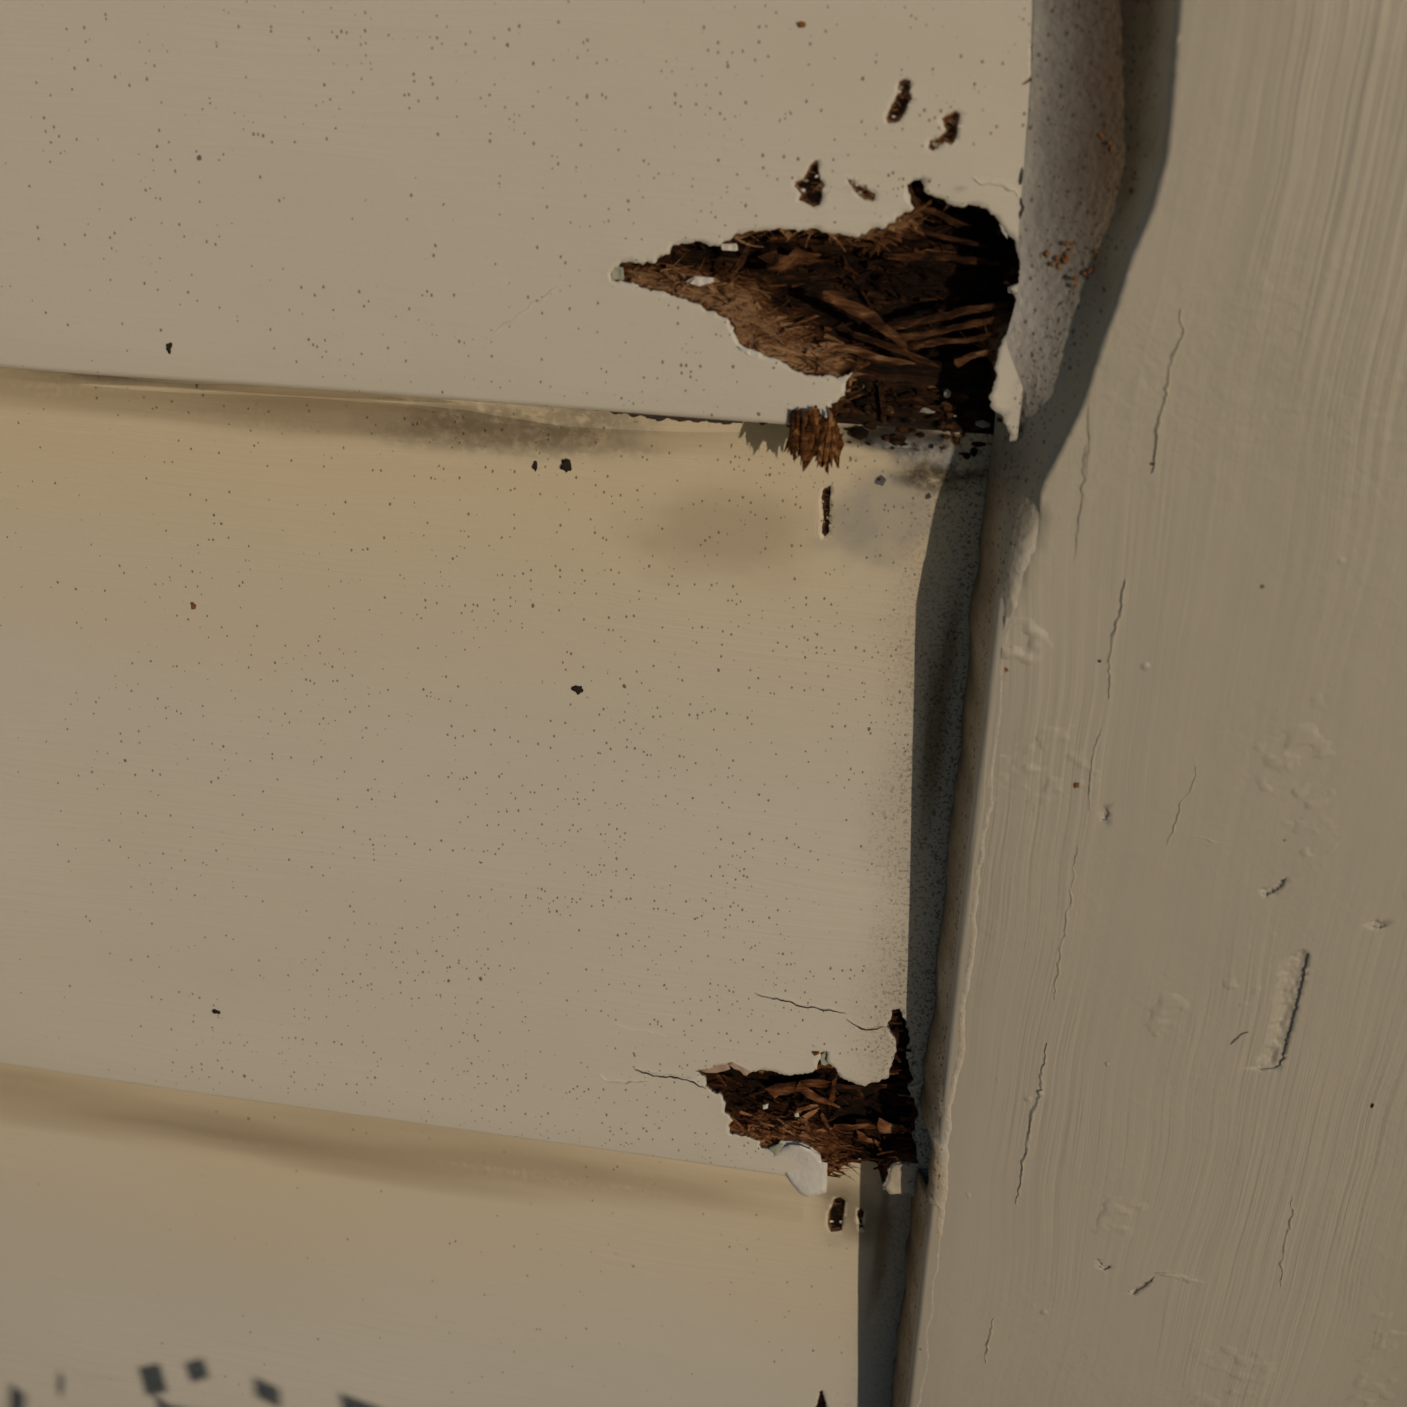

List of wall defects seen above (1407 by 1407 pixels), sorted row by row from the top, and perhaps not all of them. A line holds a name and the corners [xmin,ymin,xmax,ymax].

peeling [795,160,875,207]
peeling [721,243,738,251]
peeling [684,276,714,286]
peeling [737,346,765,358]
peeling [700,1063,750,1076]
peeling [769,1144,864,1231]
peeling [884,1164,917,1198]